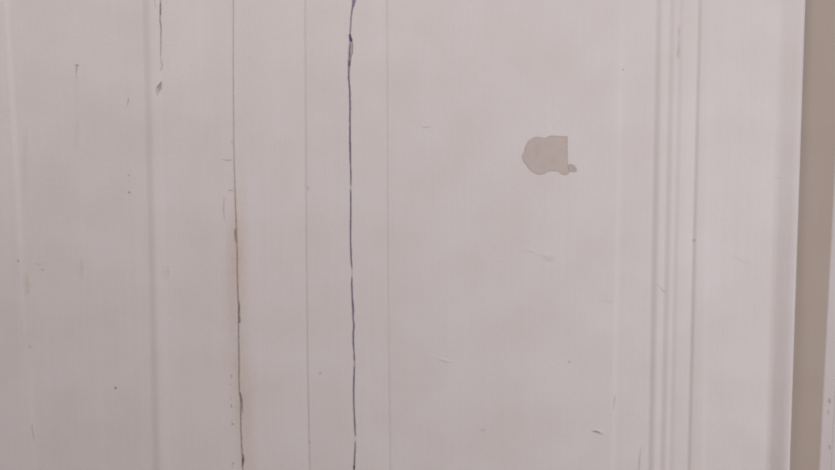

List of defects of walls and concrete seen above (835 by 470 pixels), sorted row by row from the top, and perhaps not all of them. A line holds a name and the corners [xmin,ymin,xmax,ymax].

crack [347,0,356,172]
peeling [522,136,569,175]
crack [348,193,356,359]
crack [350,381,358,469]